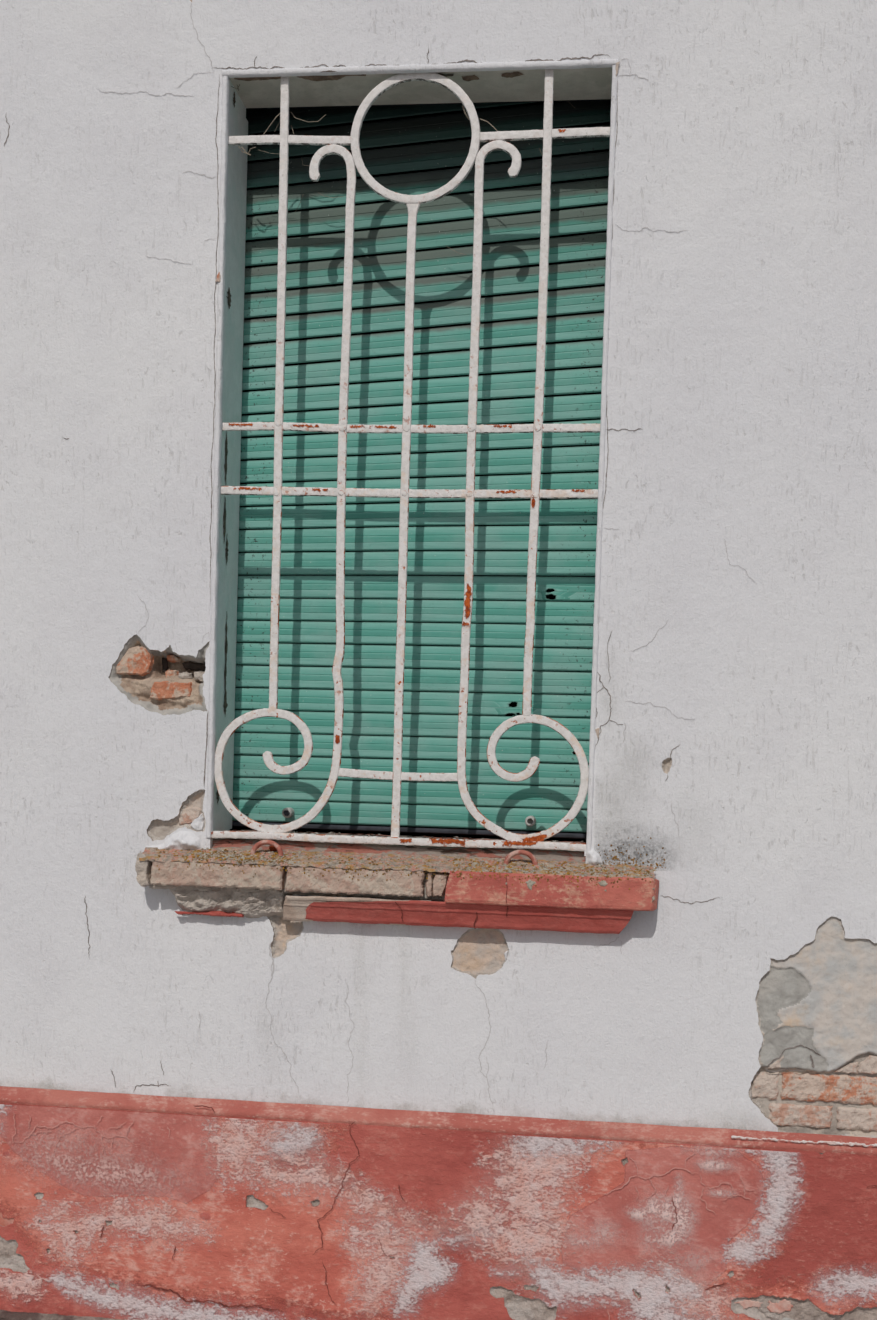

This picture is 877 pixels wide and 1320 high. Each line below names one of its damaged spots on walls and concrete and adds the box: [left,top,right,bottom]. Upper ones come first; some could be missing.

crack [526,54,687,239]
crack [98,2,385,598]
spalling [109,635,209,715]
corrosion [462,583,472,626]
spalling [148,789,219,841]
crack [265,942,300,1097]
crack [311,981,360,1306]
crack [474,979,494,1111]
spalling [201,915,877,1320]
peeling [0,1192,286,1320]